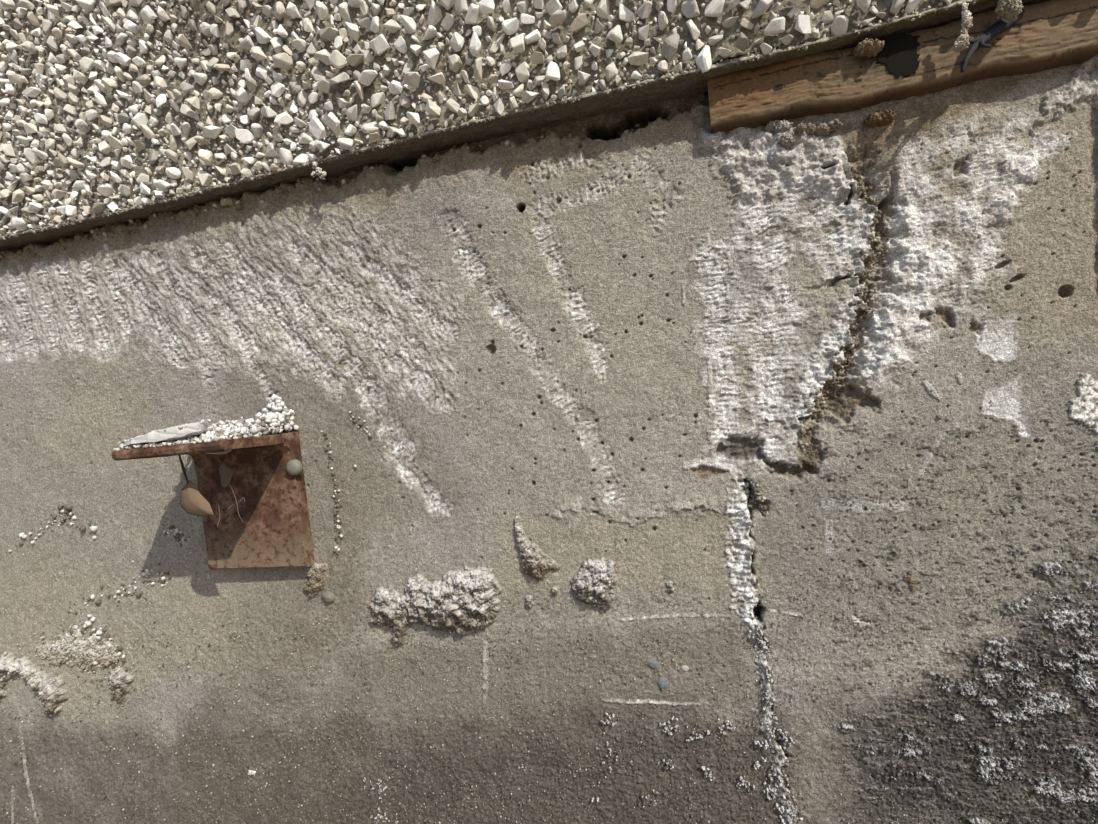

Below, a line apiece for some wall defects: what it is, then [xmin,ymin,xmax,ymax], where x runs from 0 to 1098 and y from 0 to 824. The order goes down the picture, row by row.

spalling [0,0,960,235]
spalling [693,55,1098,400]
peeling [120,422,208,447]
damp [0,379,1098,824]
crack [714,143,900,824]